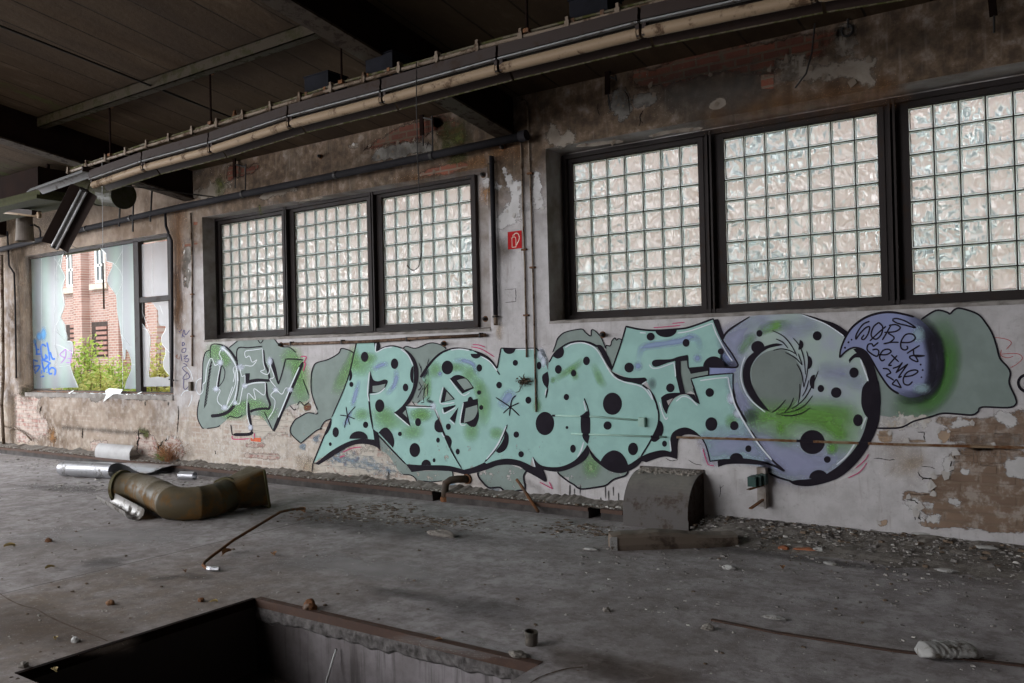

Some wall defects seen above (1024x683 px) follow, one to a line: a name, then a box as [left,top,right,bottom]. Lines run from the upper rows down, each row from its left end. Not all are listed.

flaking render [610,23,877,122]
peeling [482,167,545,230]
flaking render [876,409,1024,533]